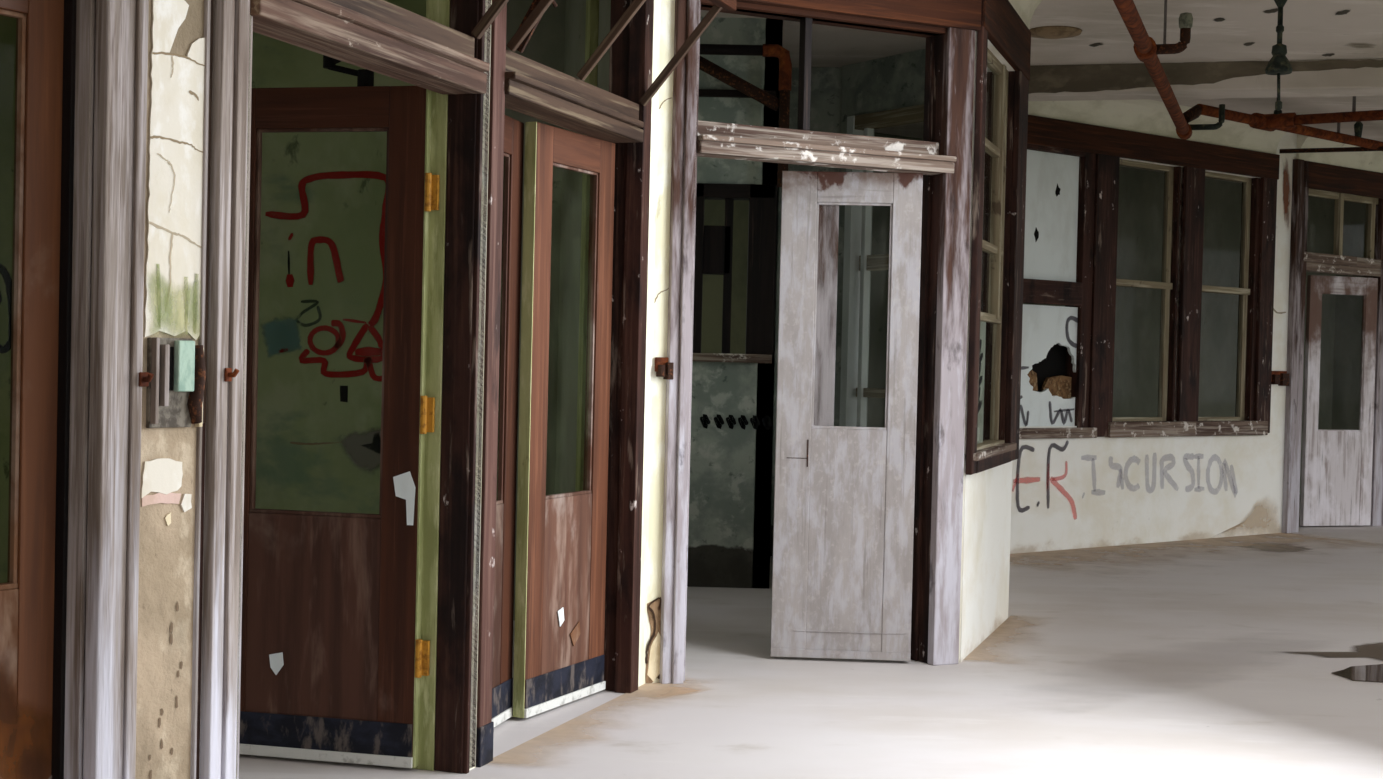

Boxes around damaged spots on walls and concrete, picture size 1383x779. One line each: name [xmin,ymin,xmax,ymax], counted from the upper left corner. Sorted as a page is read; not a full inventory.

crack [152,52,205,101]
peeling [144,0,205,340]
crack [148,135,203,294]
damp [154,264,198,335]
peeling [141,458,192,526]
damp [1230,507,1308,552]